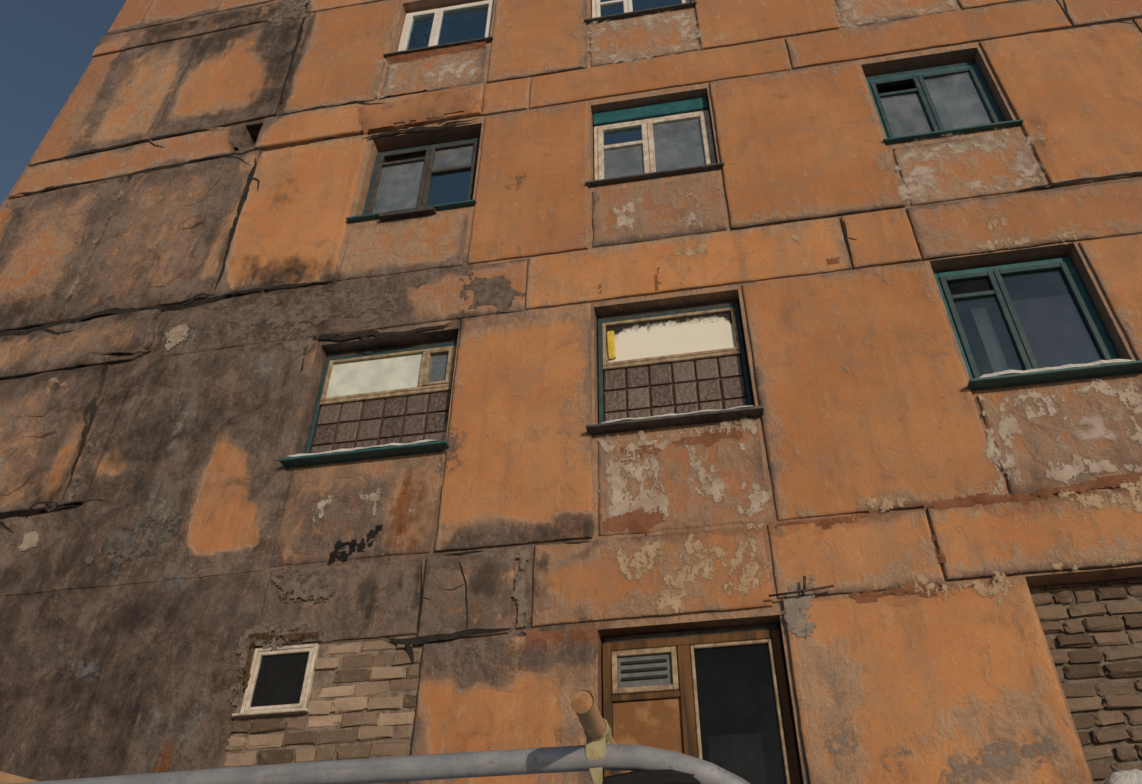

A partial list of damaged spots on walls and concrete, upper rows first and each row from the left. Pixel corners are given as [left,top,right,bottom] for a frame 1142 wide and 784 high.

crack [274,17,448,117]
crack [0,115,481,337]
spalling [207,279,427,379]
spalling [455,271,526,318]
peeling [598,417,759,519]
peeling [978,395,1006,495]
peeling [1058,476,1142,513]
peeling [609,482,773,613]
crack [386,550,512,664]